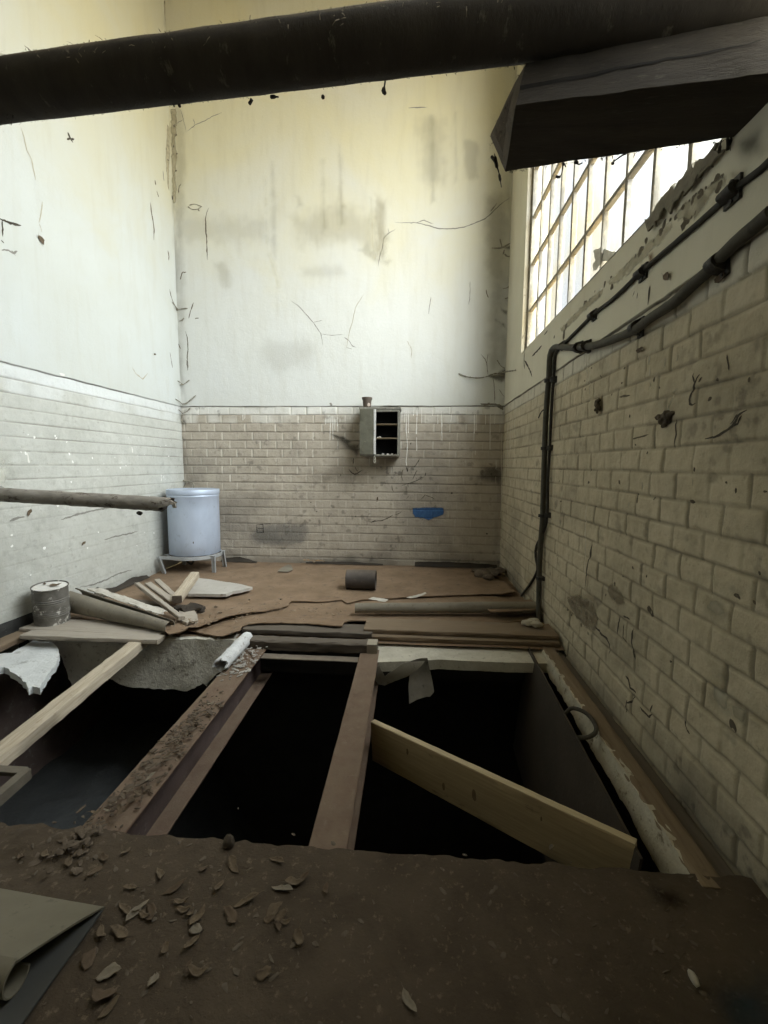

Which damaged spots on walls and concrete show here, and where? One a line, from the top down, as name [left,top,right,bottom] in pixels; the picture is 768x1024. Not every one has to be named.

crack [378,199,508,265]
spalling [554,173,725,340]
crack [291,297,362,349]
crack [705,410,747,439]
crack [595,616,653,718]